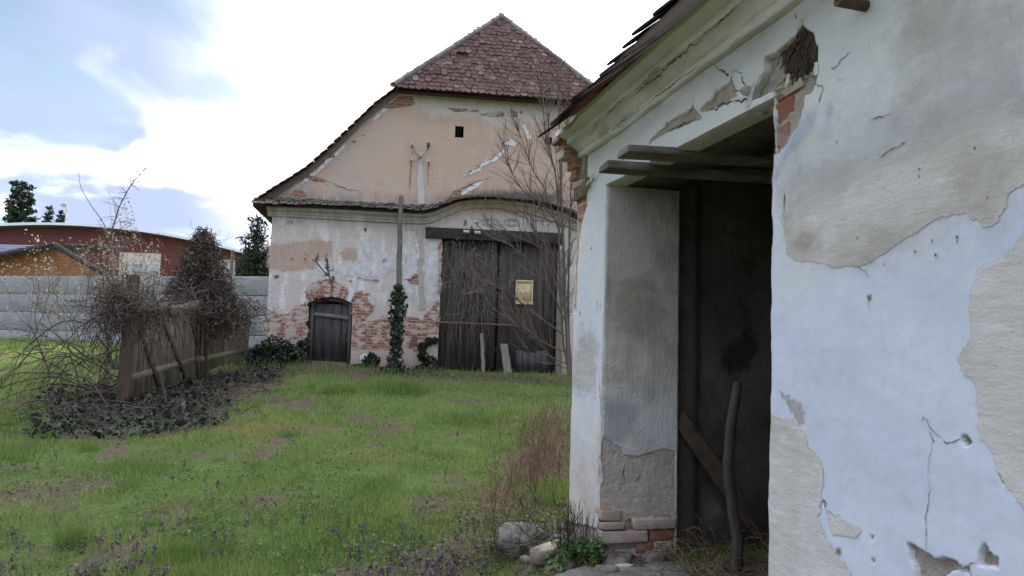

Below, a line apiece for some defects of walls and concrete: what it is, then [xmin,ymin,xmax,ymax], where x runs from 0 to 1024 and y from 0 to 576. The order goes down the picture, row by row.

spalling [373,96,415,121]
flaking render [449,108,532,198]
spalling [650,71,756,144]
spalling [772,62,819,153]
peeling [262,228,443,361]
peeling [957,230,1024,509]
flaking render [571,436,676,553]
peeling [768,391,852,576]
crack [921,417,960,550]
spalling [915,546,966,576]
spalling [985,551,999,565]